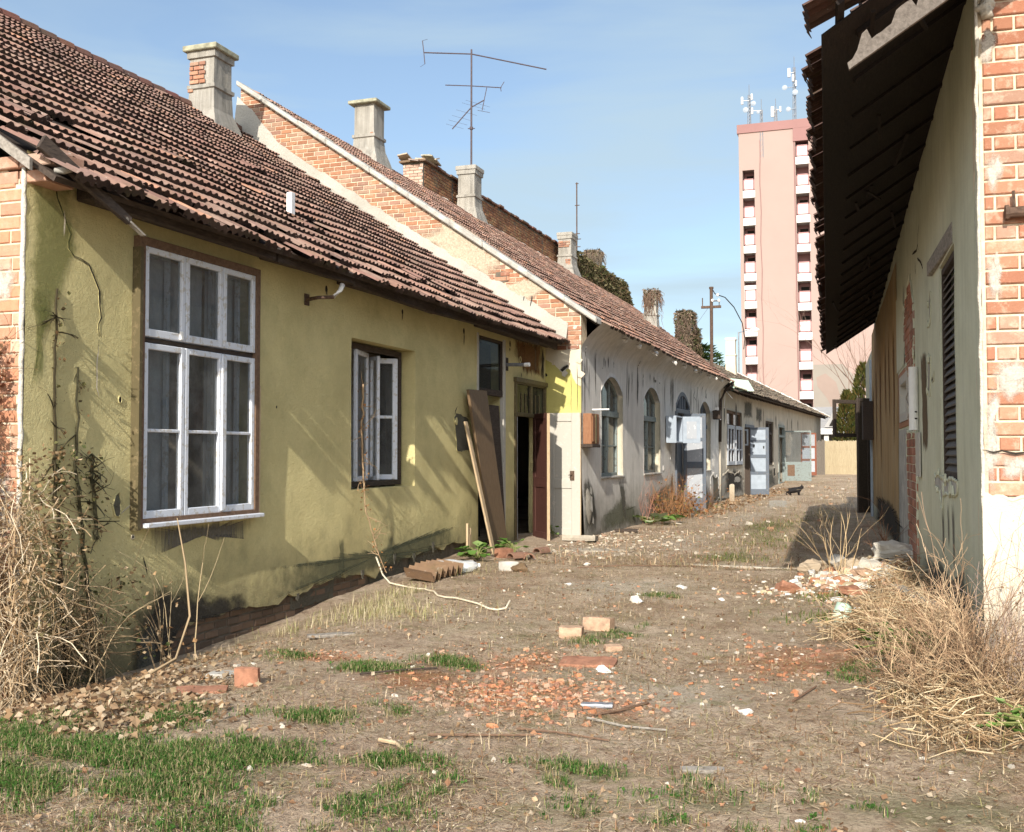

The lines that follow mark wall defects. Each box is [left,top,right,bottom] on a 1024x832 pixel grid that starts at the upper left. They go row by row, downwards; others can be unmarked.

flaking render [902,274,935,397]
water stain [577,352,609,405]
water stain [605,482,635,528]
water stain [137,589,245,669]
flaking render [166,542,464,658]